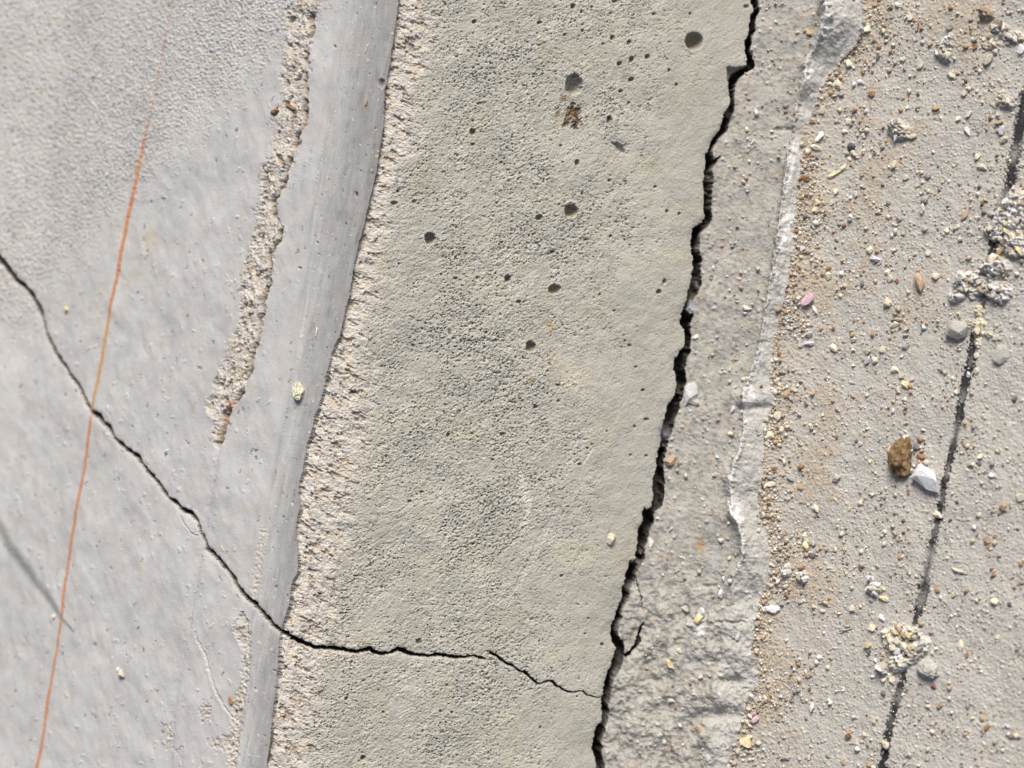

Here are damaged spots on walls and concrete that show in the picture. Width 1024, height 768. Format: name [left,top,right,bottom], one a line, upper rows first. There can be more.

spalling [203,0,320,449]
crack [0,0,760,768]